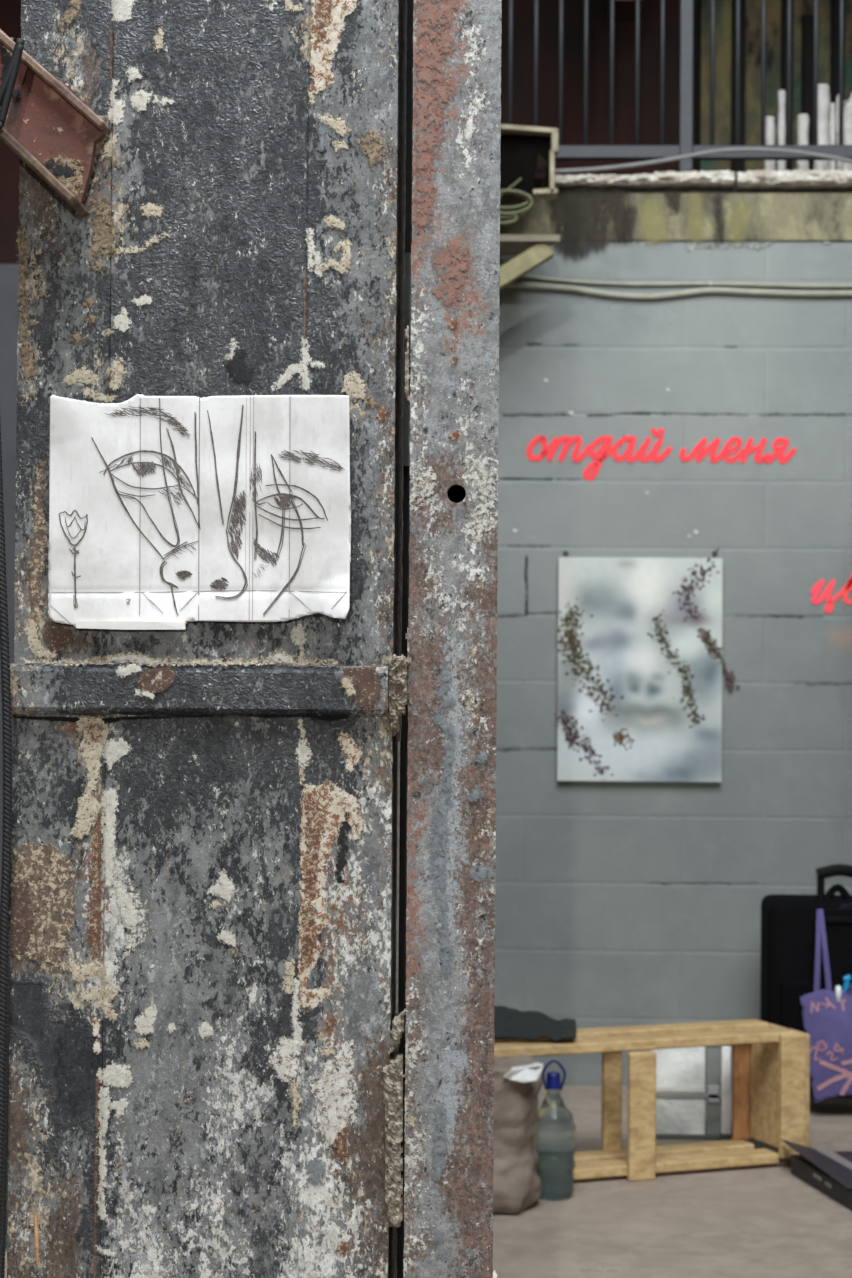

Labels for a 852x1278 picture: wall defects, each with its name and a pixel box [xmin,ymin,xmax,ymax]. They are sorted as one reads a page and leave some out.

peeling [41,0,174,272]
peeling [271,214,352,391]
peeling [265,0,386,167]
rust [413,0,461,234]
rust [430,241,471,330]
damp [548,185,637,260]
damp [714,193,724,243]
rust [447,430,464,442]
rust [9,796,103,974]
peeling [60,714,150,961]
peeling [264,719,365,1144]
peeling [67,956,133,1220]